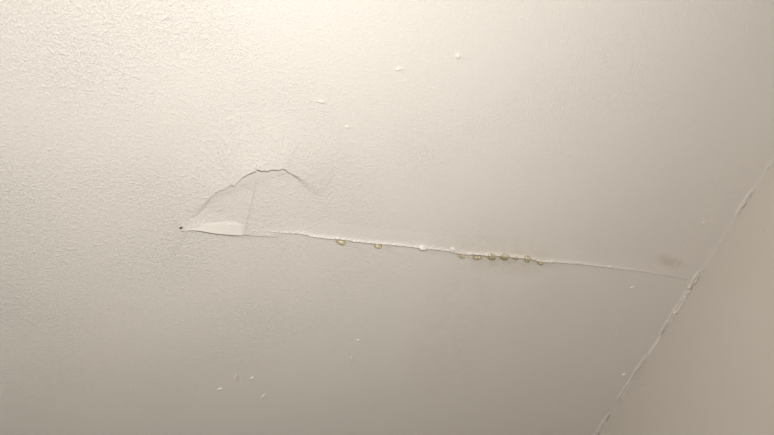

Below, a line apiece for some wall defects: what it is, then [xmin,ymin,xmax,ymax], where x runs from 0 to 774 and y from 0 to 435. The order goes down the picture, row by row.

crack [179,155,774,435]